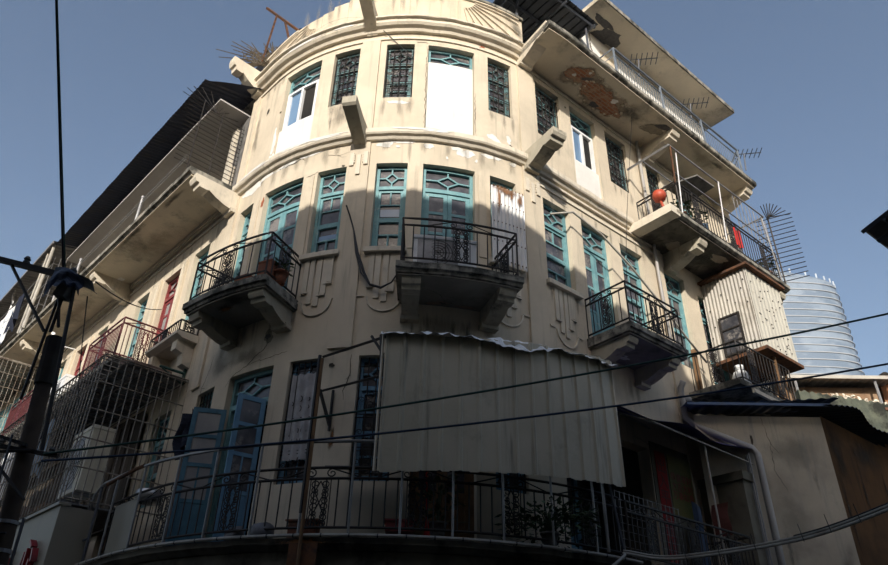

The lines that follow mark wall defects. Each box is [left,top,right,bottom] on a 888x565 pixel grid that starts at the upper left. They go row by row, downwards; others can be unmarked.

spalling [590,13,621,48]
spalling [559,63,628,118]